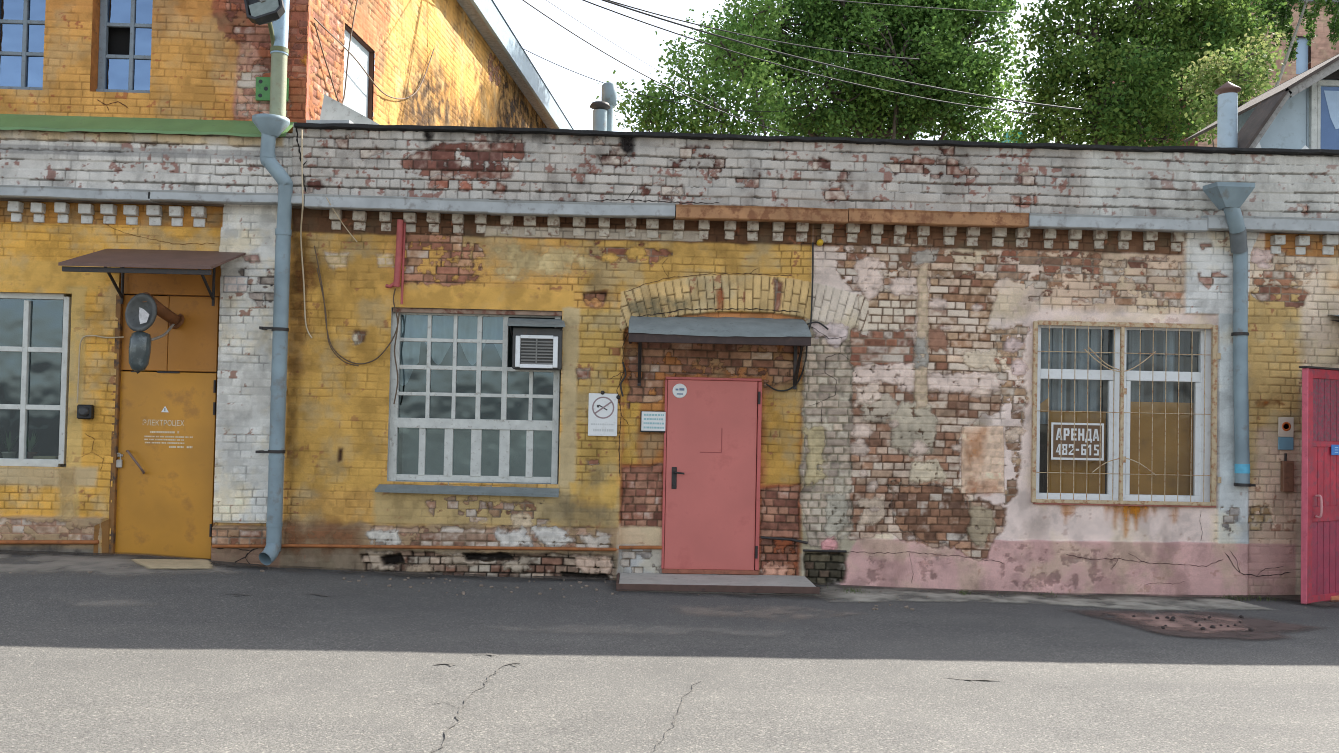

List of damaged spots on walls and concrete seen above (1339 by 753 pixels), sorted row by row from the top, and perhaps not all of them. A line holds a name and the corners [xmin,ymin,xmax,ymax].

peeling [224,0,271,117]
peeling [287,0,363,120]
damp [404,70,547,140]
peeling [401,140,525,194]
damp [620,137,634,153]
peeling [376,232,485,287]
peeling [1251,248,1314,308]
flaking render [627,244,1227,585]
spalling [362,463,663,580]
crack [1066,515,1289,585]
spalling [1221,506,1273,532]